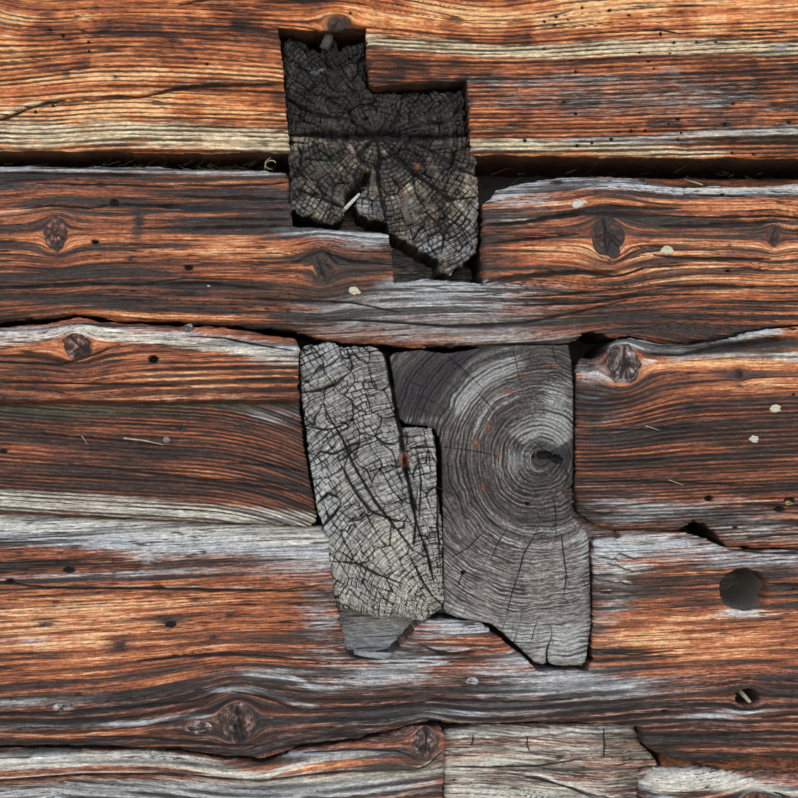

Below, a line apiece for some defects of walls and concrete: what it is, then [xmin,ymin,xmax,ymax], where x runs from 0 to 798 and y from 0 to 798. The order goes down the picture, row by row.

crack [288,50,477,253]
crack [302,348,353,393]
crack [309,352,494,603]